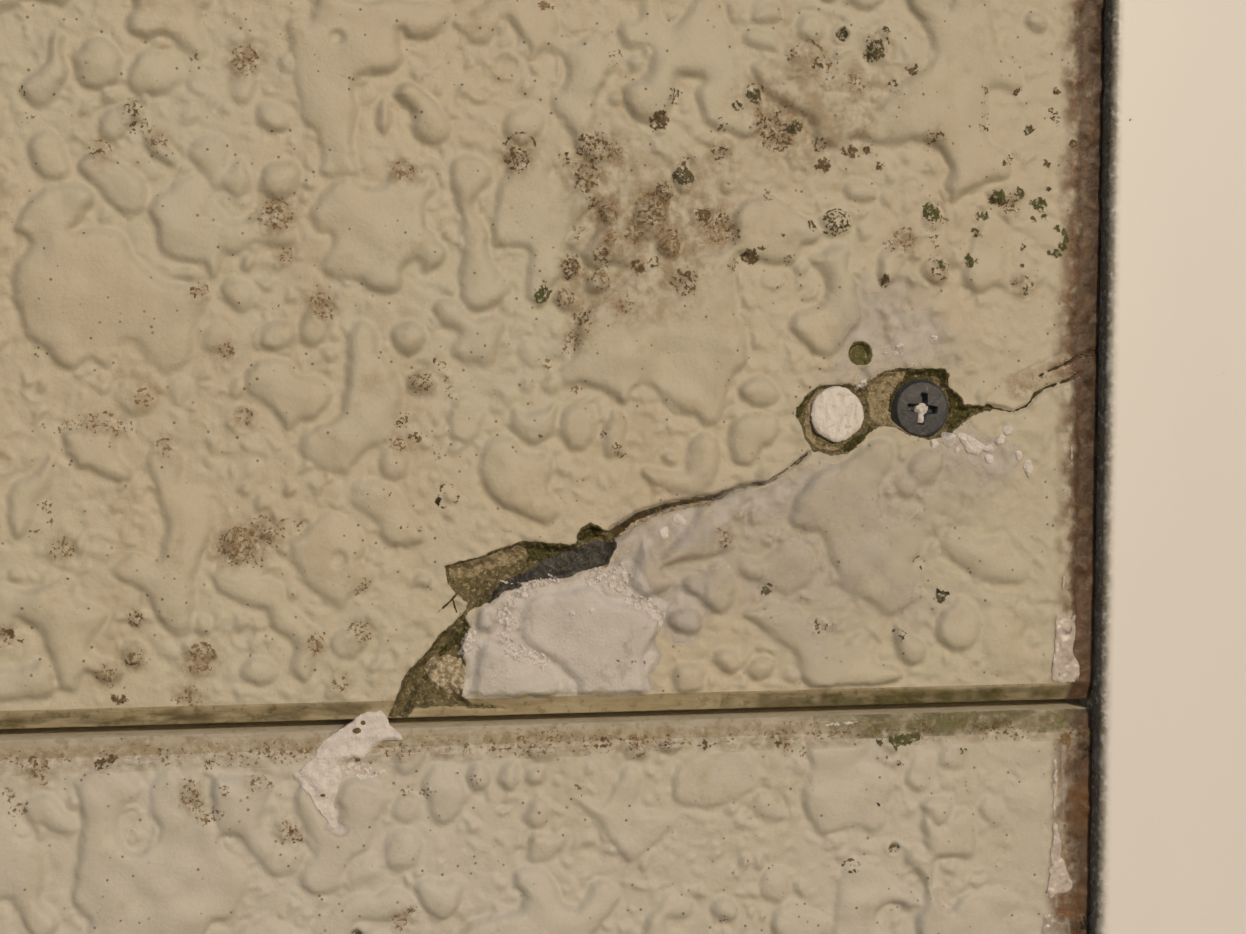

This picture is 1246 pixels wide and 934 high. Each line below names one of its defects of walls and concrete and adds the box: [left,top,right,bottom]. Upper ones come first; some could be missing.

spalling [796,368,1014,464]
crack [984,350,1096,412]
peeling [659,513,686,538]
crack [610,452,808,539]
crack [438,593,457,613]
peeling [293,522,672,836]